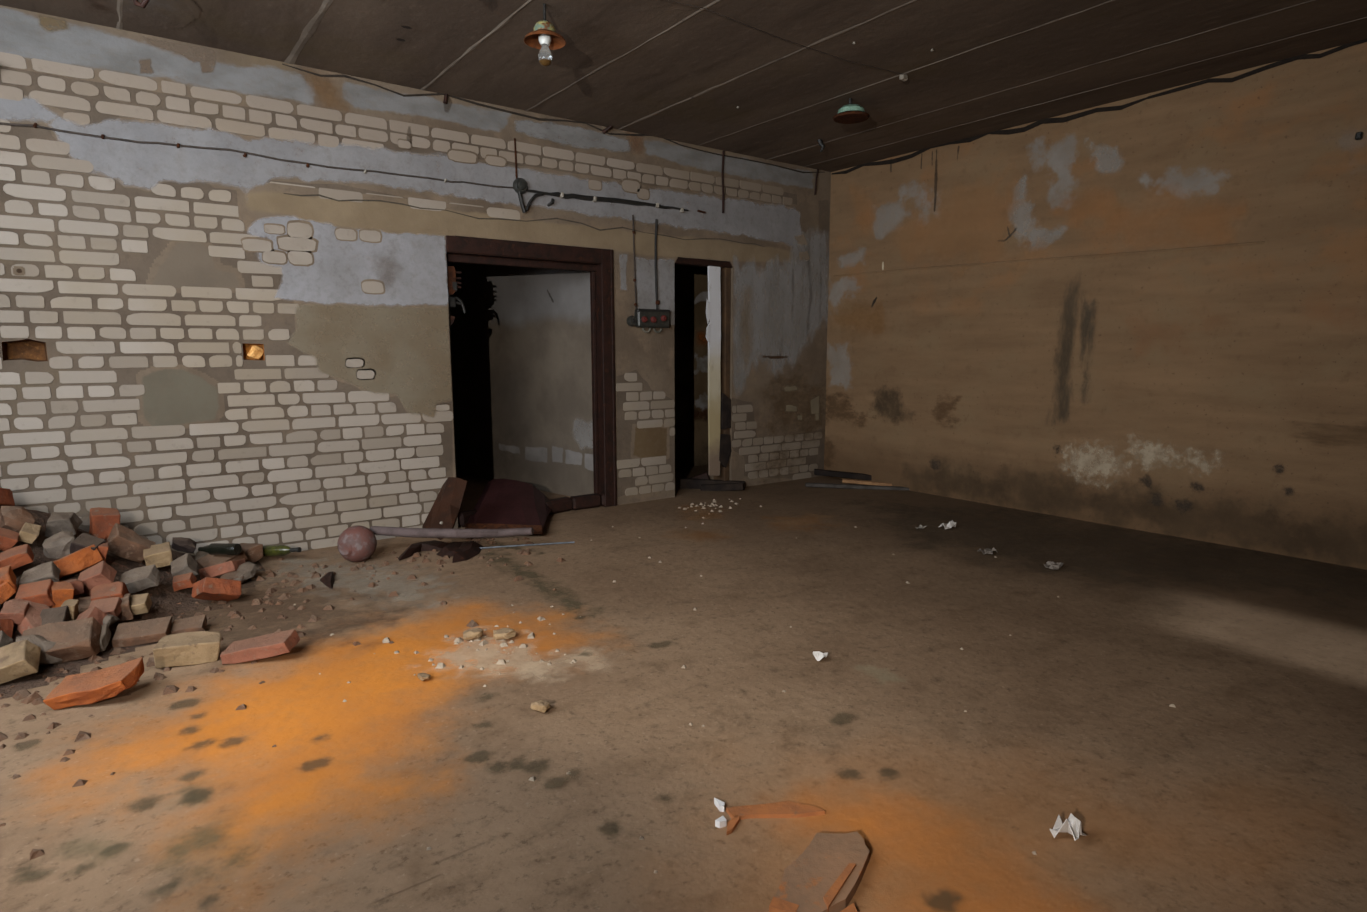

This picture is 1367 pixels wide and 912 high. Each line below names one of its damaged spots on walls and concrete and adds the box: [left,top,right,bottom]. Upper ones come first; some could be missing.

peeling [0,5,947,417]
water stain [756,259,1367,610]